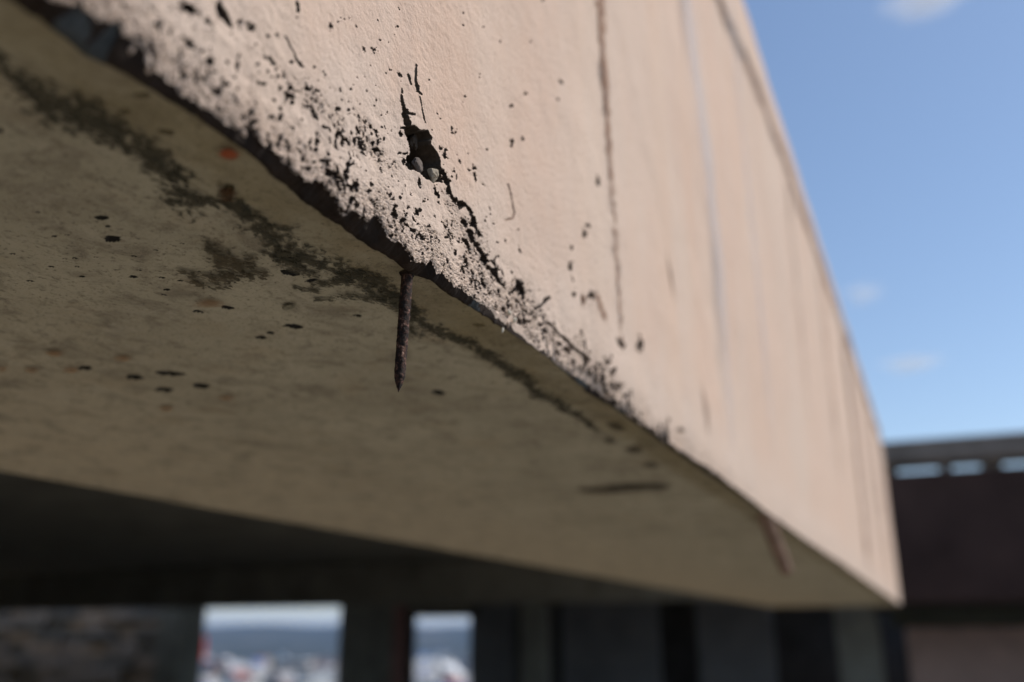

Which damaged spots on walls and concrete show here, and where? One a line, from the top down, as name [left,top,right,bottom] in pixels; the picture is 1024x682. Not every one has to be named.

damp [0,52,600,434]
spalling [44,0,901,605]